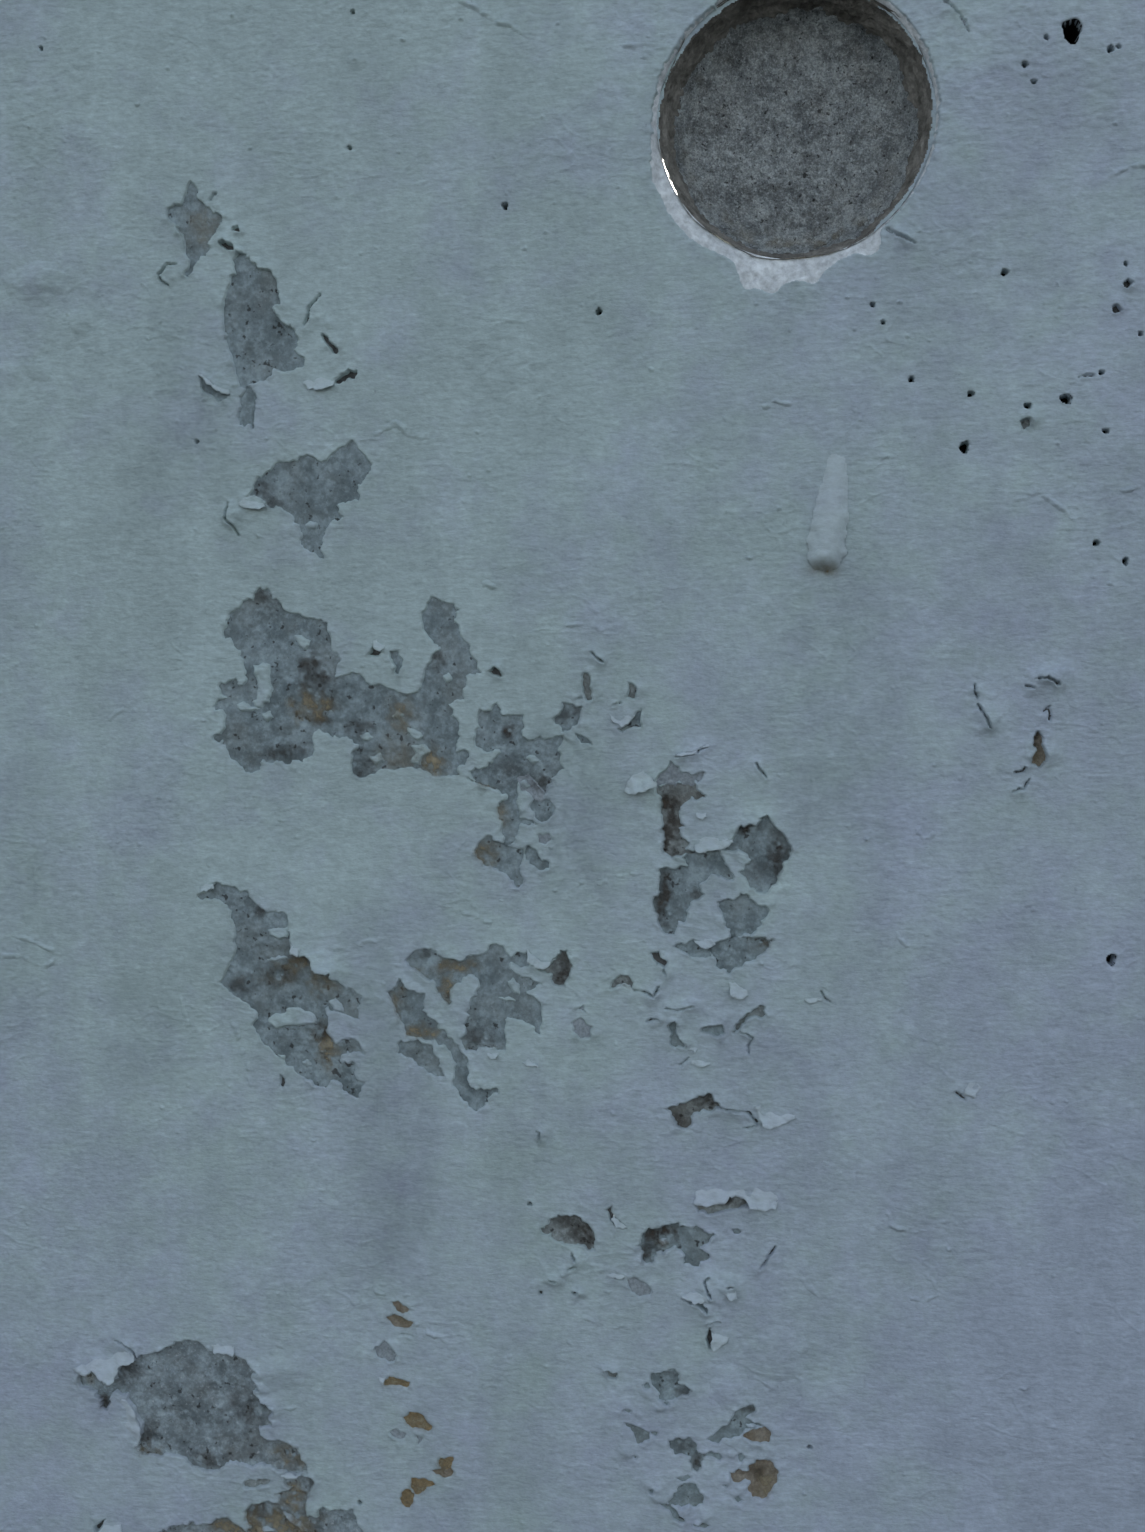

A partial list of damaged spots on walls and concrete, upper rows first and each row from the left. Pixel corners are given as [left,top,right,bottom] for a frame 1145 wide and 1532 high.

peeling [168,182,222,277]
peeling [198,254,357,429]
peeling [238,441,372,559]
peeling [214,588,592,887]
peeling [624,744,791,1000]
peeling [198,883,364,1098]
peeling [388,944,572,1111]
peeling [668,1093,720,1128]
peeling [541,1215,595,1249]
peeling [600,1188,778,1296]
peeling [73,1340,363,1532]
peeling [625,1405,771,1507]